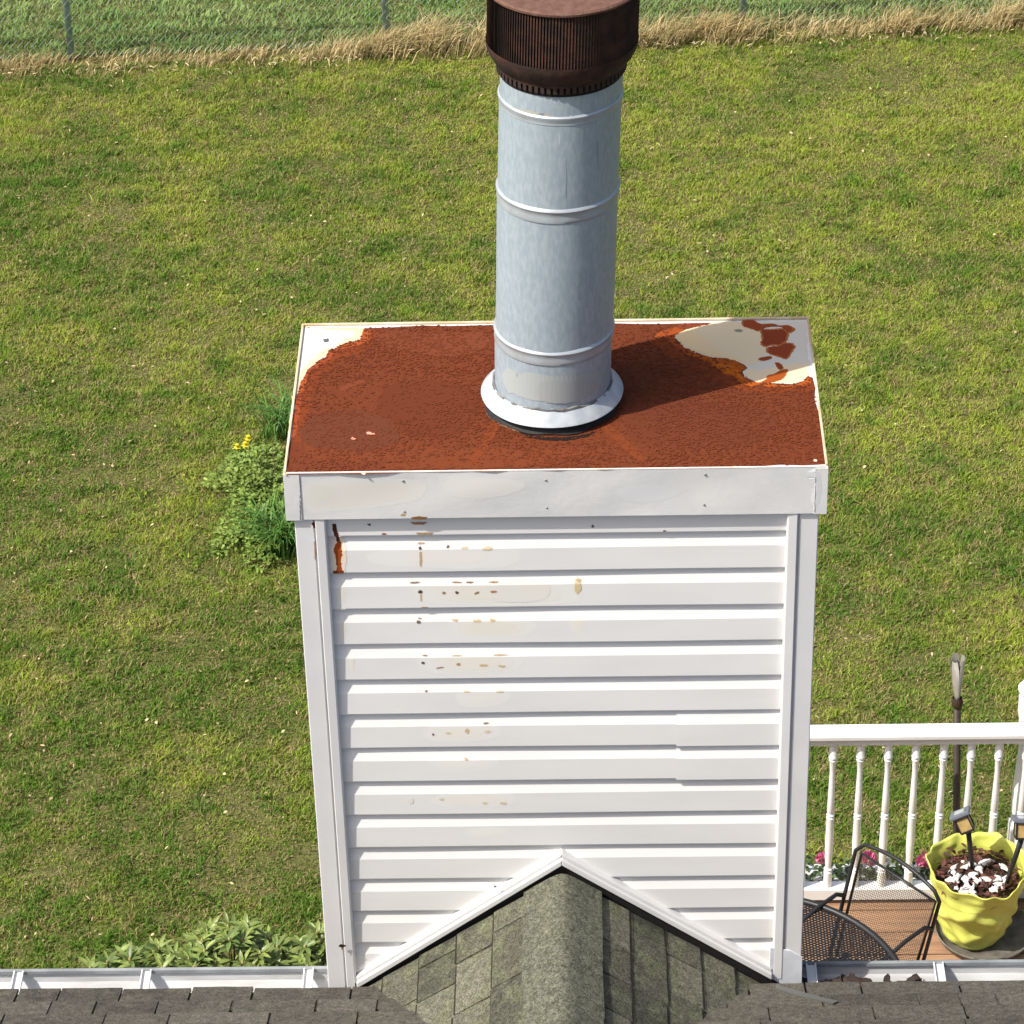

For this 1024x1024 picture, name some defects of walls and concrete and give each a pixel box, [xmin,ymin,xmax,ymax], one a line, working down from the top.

corrosion [287,320,825,475]
corrosion [329,524,347,574]
corrosion [401,513,433,566]